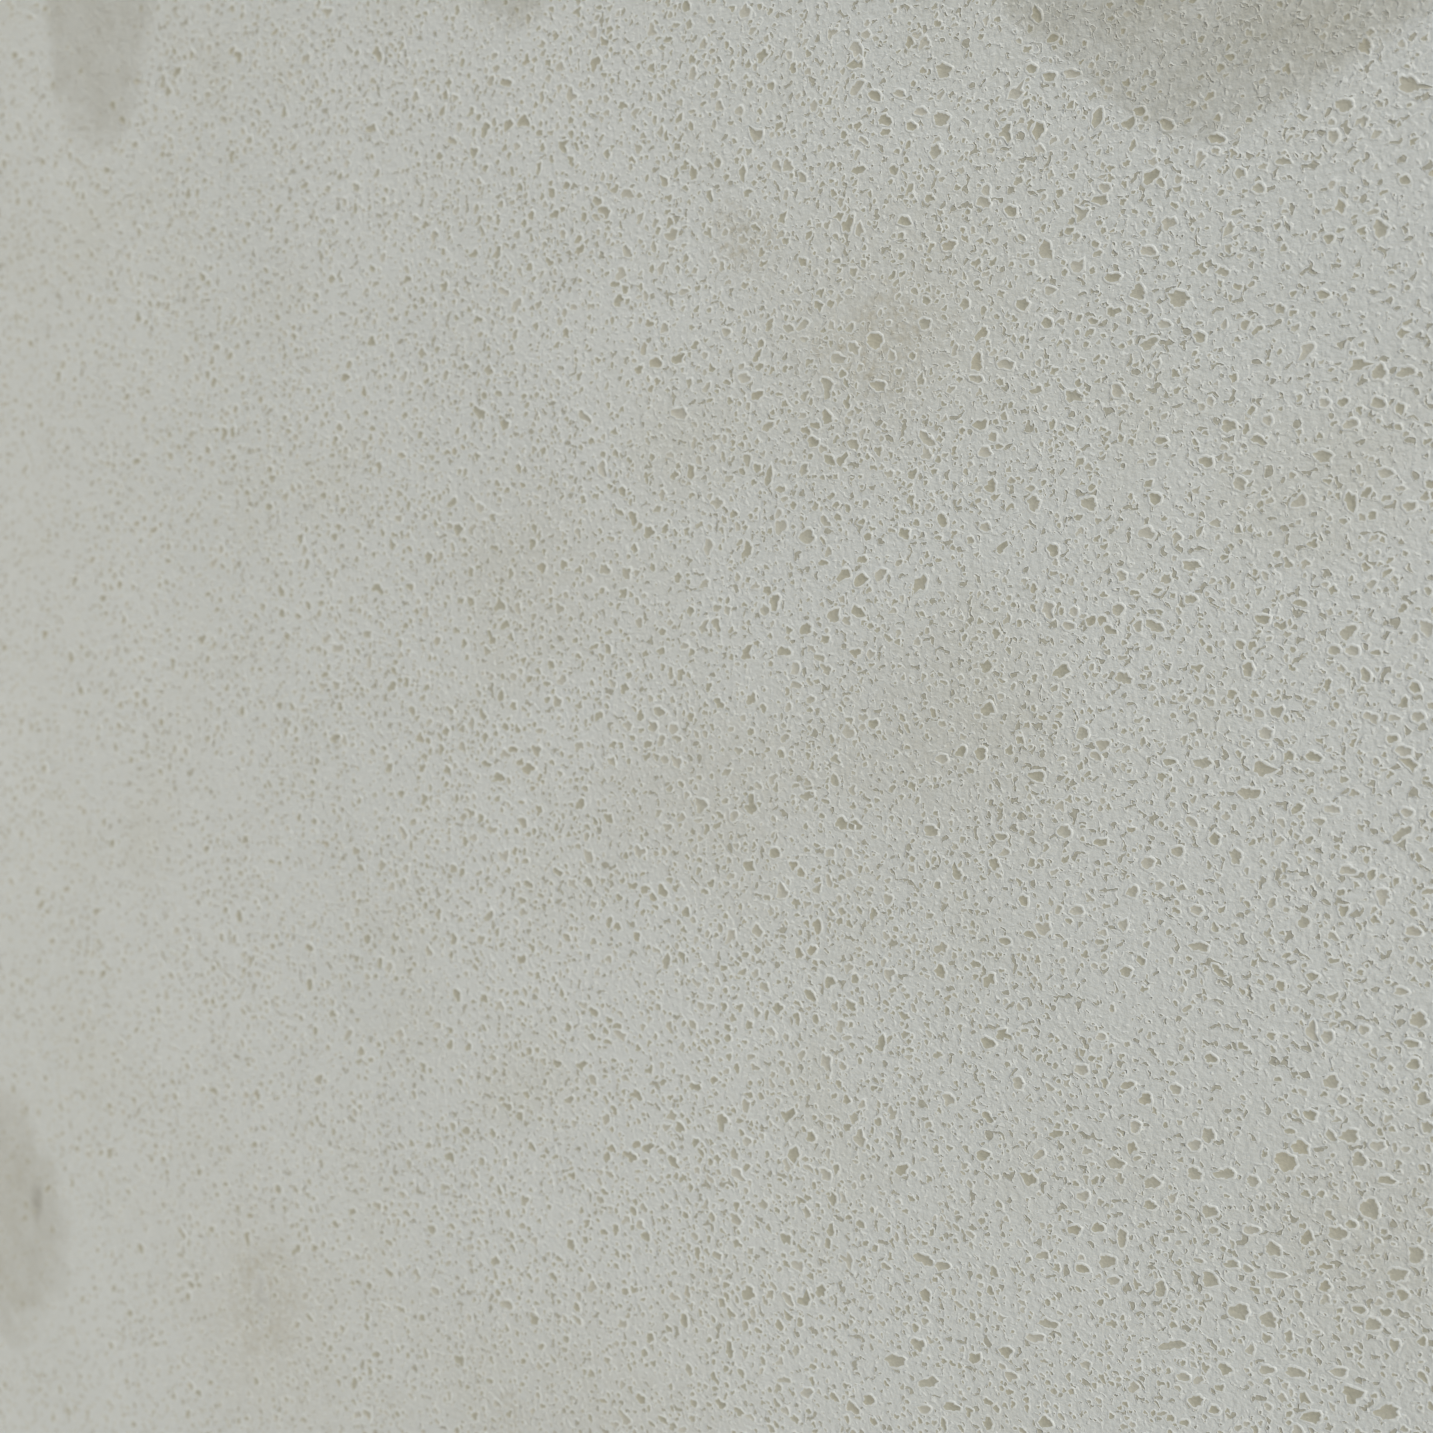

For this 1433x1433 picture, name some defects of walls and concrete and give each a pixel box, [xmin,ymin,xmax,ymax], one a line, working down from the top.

leakage [41,0,159,166]
leakage [455,0,565,43]
leakage [997,0,1433,146]